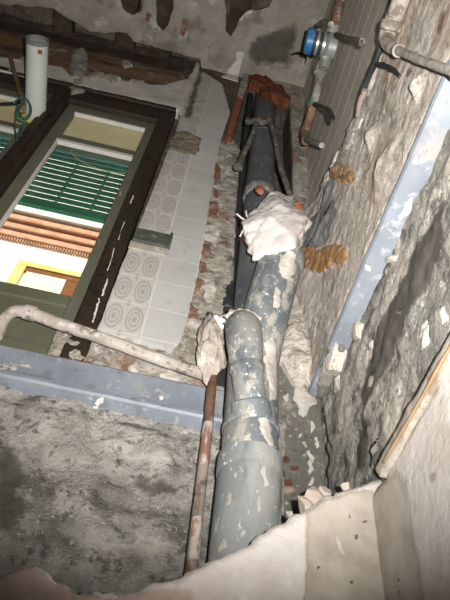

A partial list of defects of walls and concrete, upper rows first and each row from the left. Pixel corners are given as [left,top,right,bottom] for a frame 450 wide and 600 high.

water stain [250,27,295,64]
flaking render [221,51,244,82]
spalling [165,131,202,157]
flaking render [194,162,222,303]
flaking render [188,302,199,321]
crack [322,407,333,490]